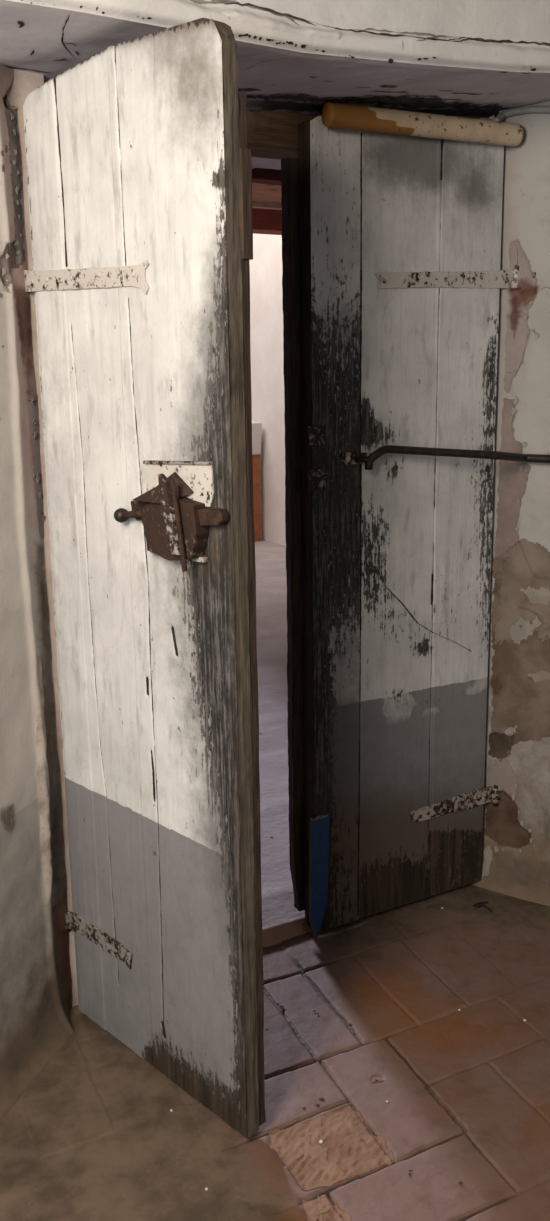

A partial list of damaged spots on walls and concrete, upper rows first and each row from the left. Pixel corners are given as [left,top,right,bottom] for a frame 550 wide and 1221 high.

crack [8,15,79,73]
crack [191,0,550,46]
spalling [481,239,550,878]